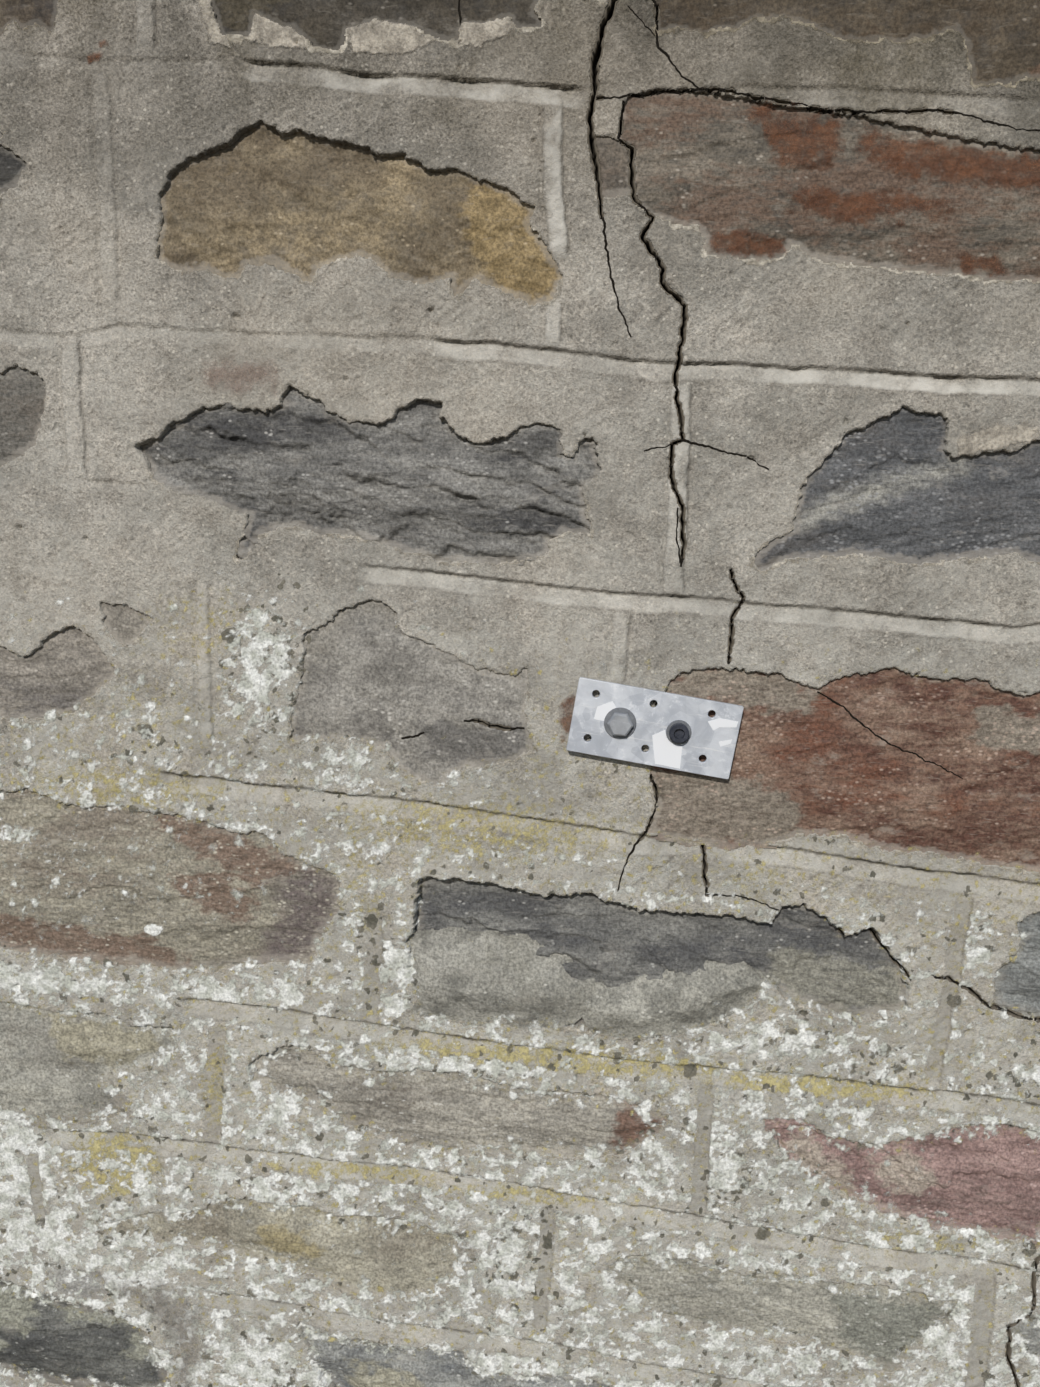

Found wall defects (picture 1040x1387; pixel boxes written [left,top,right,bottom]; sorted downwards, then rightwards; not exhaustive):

spalling [199,0,545,54]
spalling [588,89,1040,284]
crack [586,0,1040,567]
spalling [140,386,601,565]
spalling [749,407,1040,575]
spalling [289,600,537,787]
crack [617,774,659,892]
crack [727,570,746,664]
spalling [648,667,1040,879]
spalling [408,876,908,1022]
crack [834,925,1040,1023]
crack [1005,1255,1040,1387]